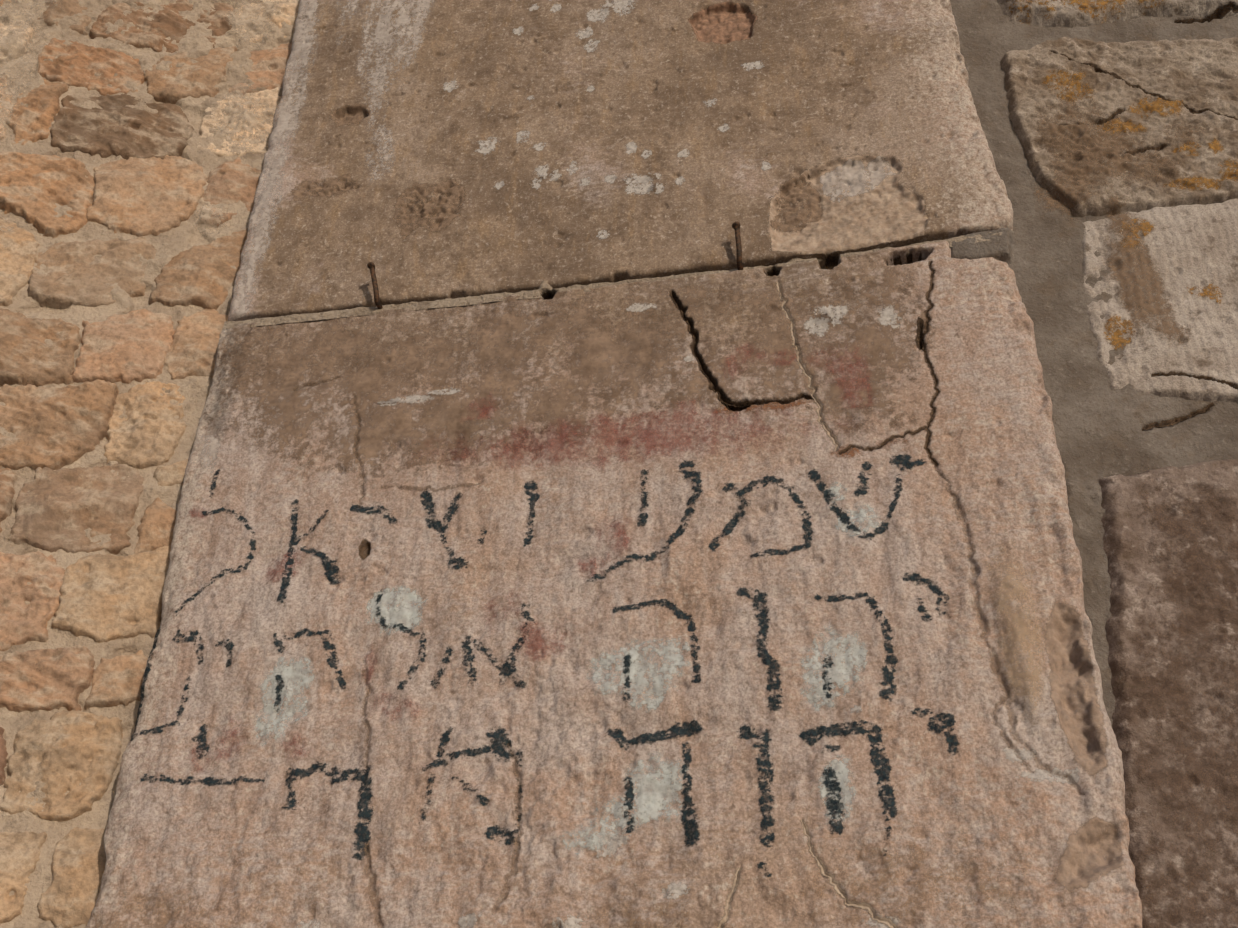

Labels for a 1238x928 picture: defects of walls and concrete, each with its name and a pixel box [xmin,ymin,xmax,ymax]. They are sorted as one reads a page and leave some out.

spalling [688,2,758,44]
crack [1174,1,1238,24]
crack [1051,50,1238,126]
crack [1125,143,1168,155]
spalling [767,154,929,257]
crack [669,261,940,467]
crack [1142,371,1238,431]